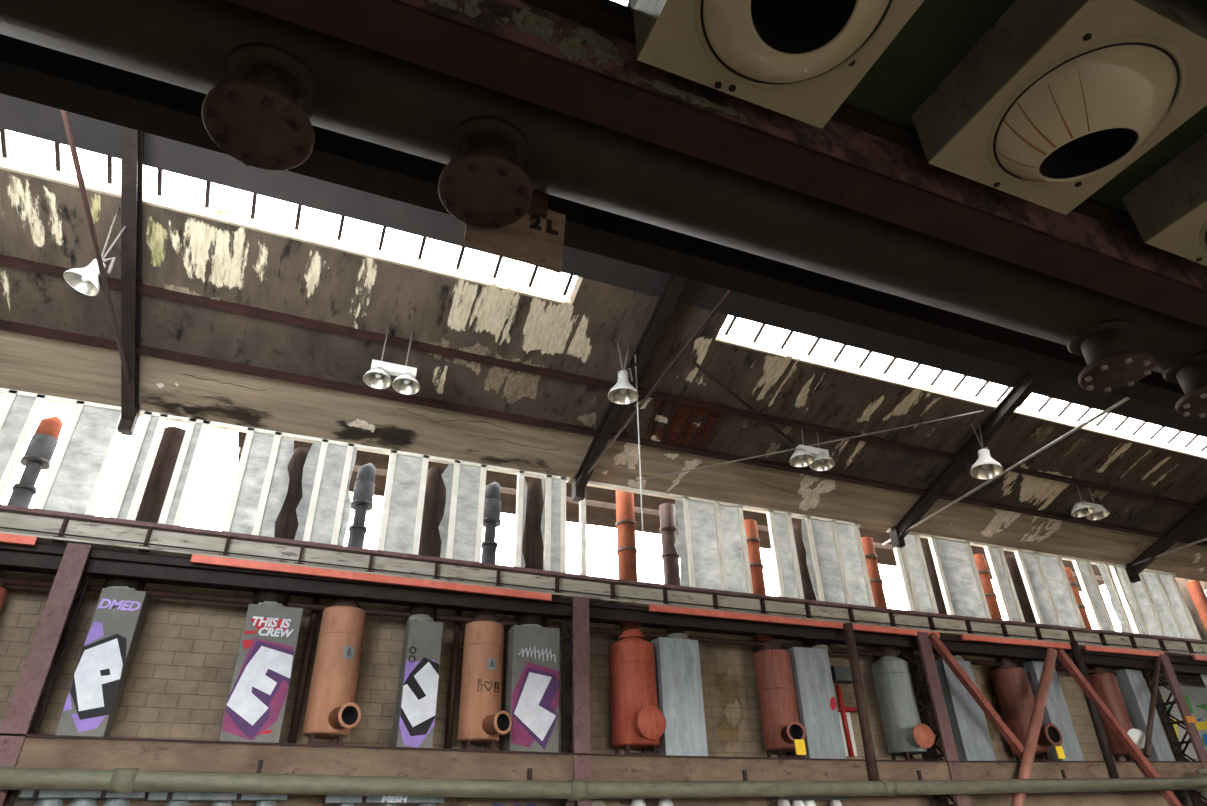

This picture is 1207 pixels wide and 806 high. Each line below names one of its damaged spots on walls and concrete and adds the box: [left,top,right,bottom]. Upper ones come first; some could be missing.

peeling [3,176,63,247]
peeling [146,205,268,300]
peeling [305,250,329,298]
peeling [350,257,377,329]
peeling [426,278,592,404]
leakage [145,397,268,427]
leakage [332,418,415,450]
spalling [601,337,728,494]
peeling [751,355,800,407]
peeling [831,388,941,469]
spalling [797,474,836,511]
peeling [980,464,1073,543]